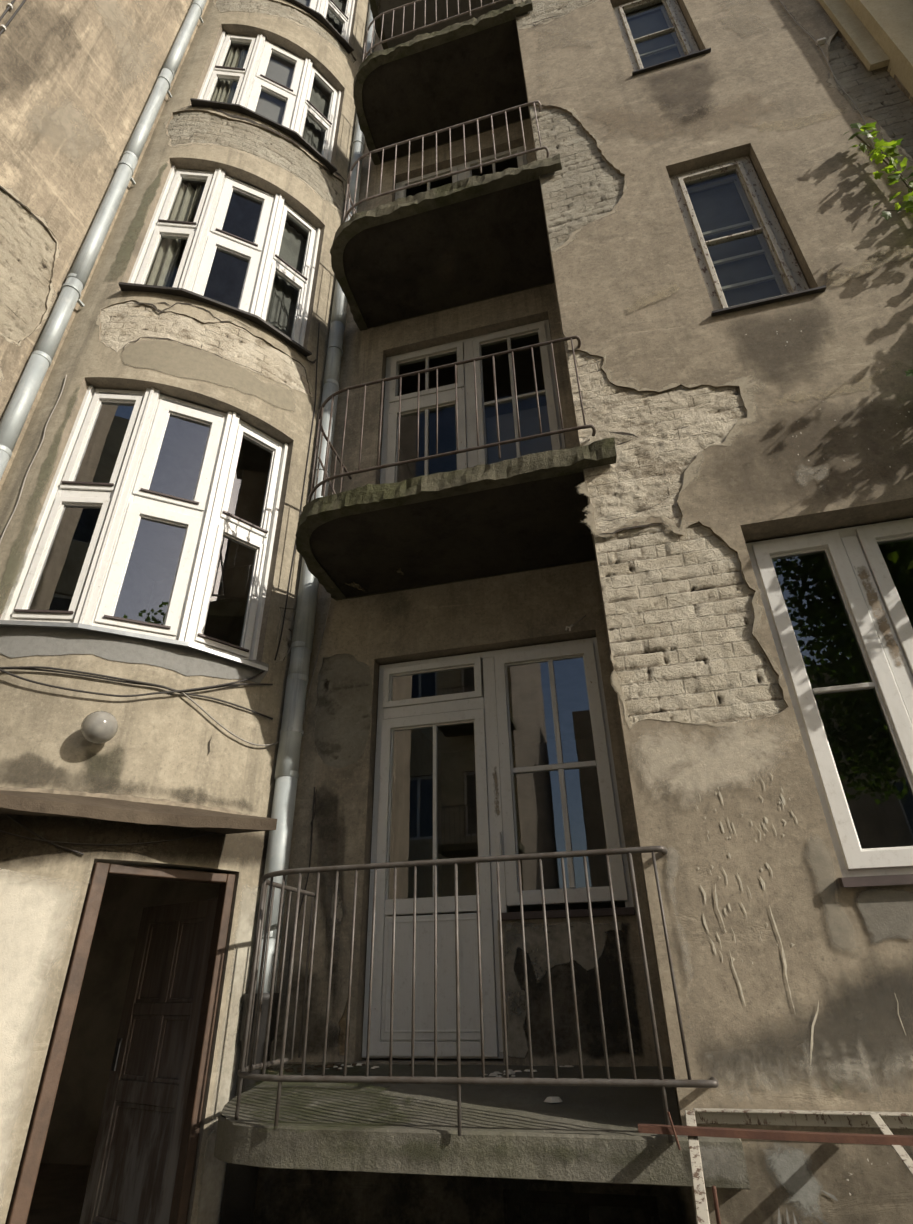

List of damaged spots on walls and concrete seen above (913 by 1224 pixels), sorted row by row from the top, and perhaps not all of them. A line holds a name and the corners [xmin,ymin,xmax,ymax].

flaking render [827,30,913,162]
flaking render [529,104,627,252]
flaking render [0,185,60,346]
flaking render [96,298,314,398]
damp [740,311,826,377]
damp [775,369,889,490]
flaking render [563,334,789,729]
damp [710,973,913,1088]